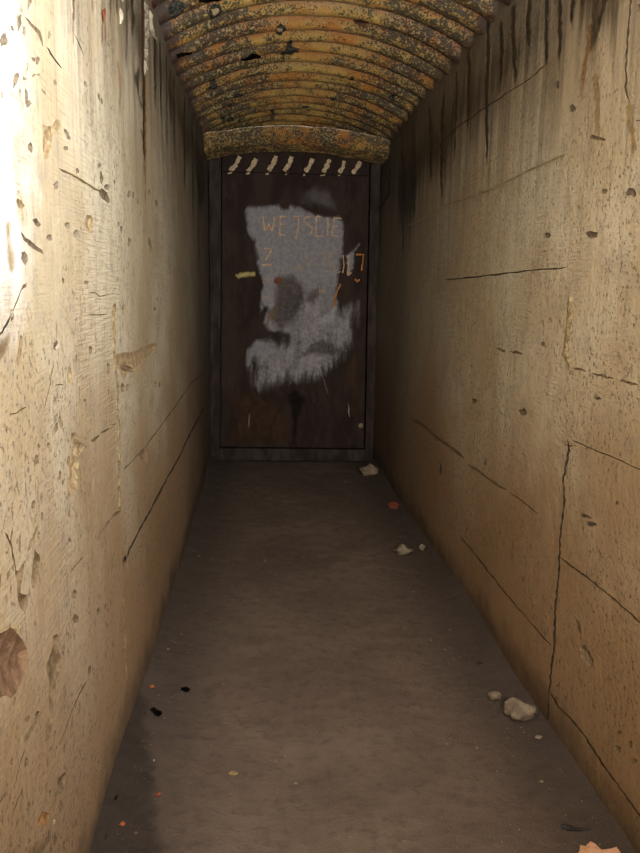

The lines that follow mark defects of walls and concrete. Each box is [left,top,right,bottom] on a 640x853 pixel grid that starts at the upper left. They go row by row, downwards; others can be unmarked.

damp [558,0,617,56]
damp [110,0,205,243]
damp [399,0,531,250]
crack [0,283,27,335]
crack [124,407,204,560]
spalling [0,624,27,706]
crack [461,439,640,816]